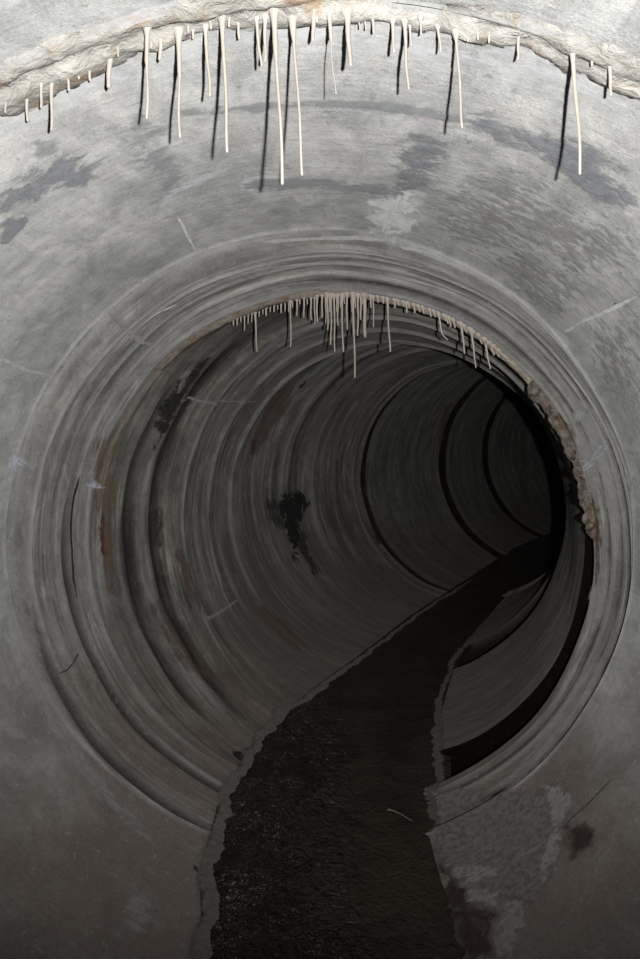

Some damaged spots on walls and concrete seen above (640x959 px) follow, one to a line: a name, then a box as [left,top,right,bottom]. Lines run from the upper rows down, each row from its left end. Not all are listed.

damp [0,0,640,116]
damp [0,143,94,244]
damp [293,101,634,207]
damp [85,281,532,500]
crack [70,476,80,599]
corrosion [92,436,120,593]
damp [266,491,320,576]
damp [567,825,593,859]